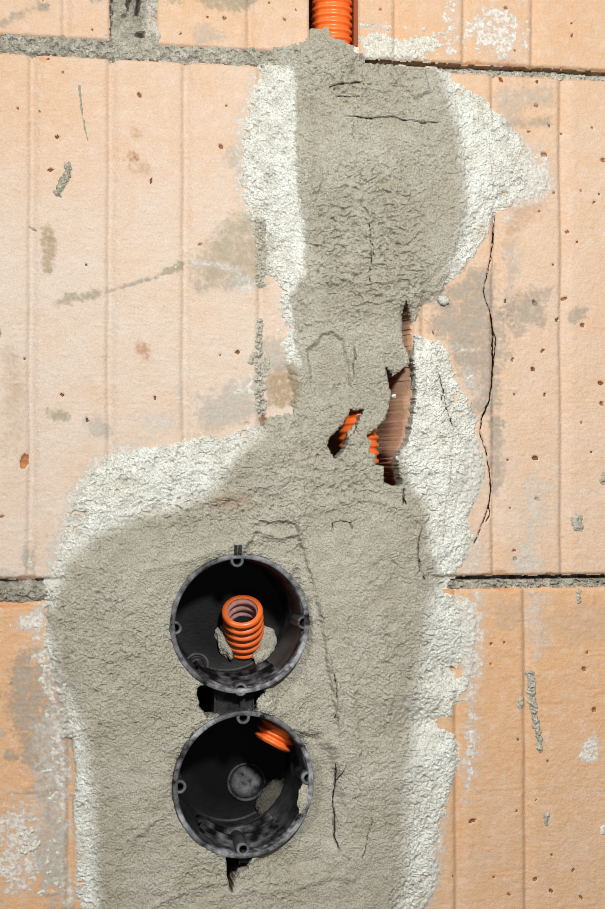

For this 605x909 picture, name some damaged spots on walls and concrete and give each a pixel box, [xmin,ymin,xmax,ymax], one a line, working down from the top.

crack [327,81,434,135]
flaking render [334,409,364,458]
hole [384,336,417,486]
crack [474,215,496,542]
crack [332,763,343,848]